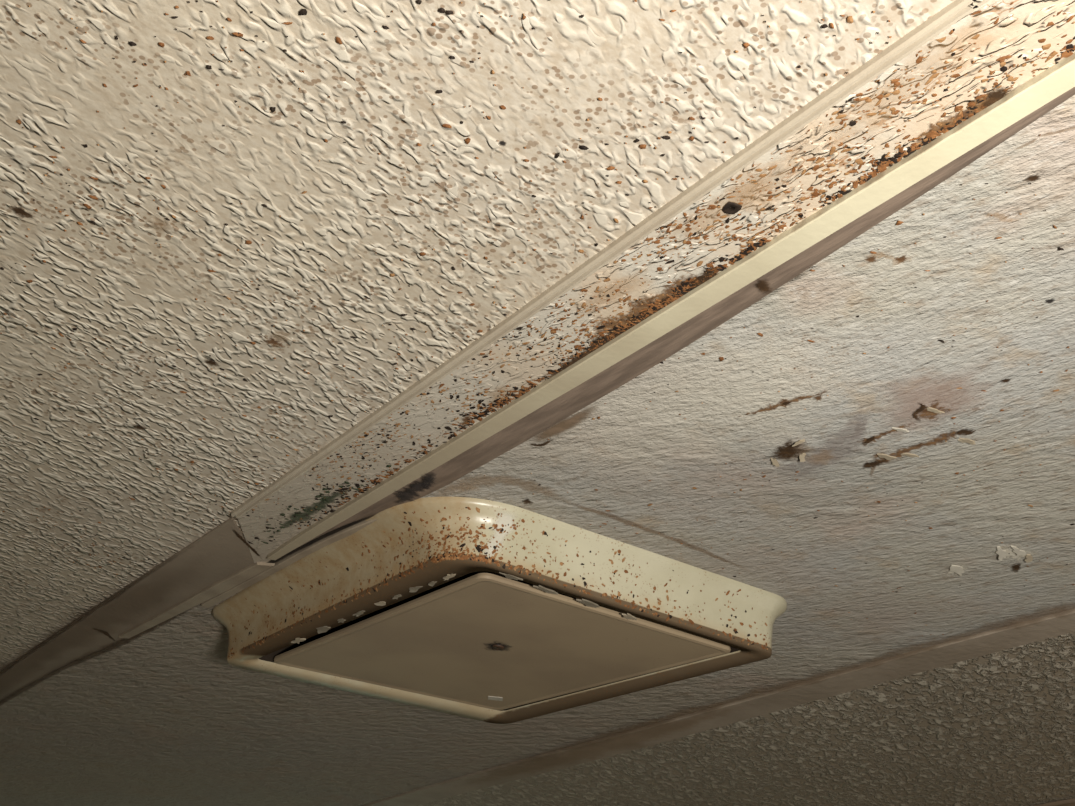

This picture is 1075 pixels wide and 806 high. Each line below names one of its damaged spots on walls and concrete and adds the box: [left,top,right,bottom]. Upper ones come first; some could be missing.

corrosion [246,10,1075,529]
spalling [863,400,950,444]
corrosion [228,507,768,659]